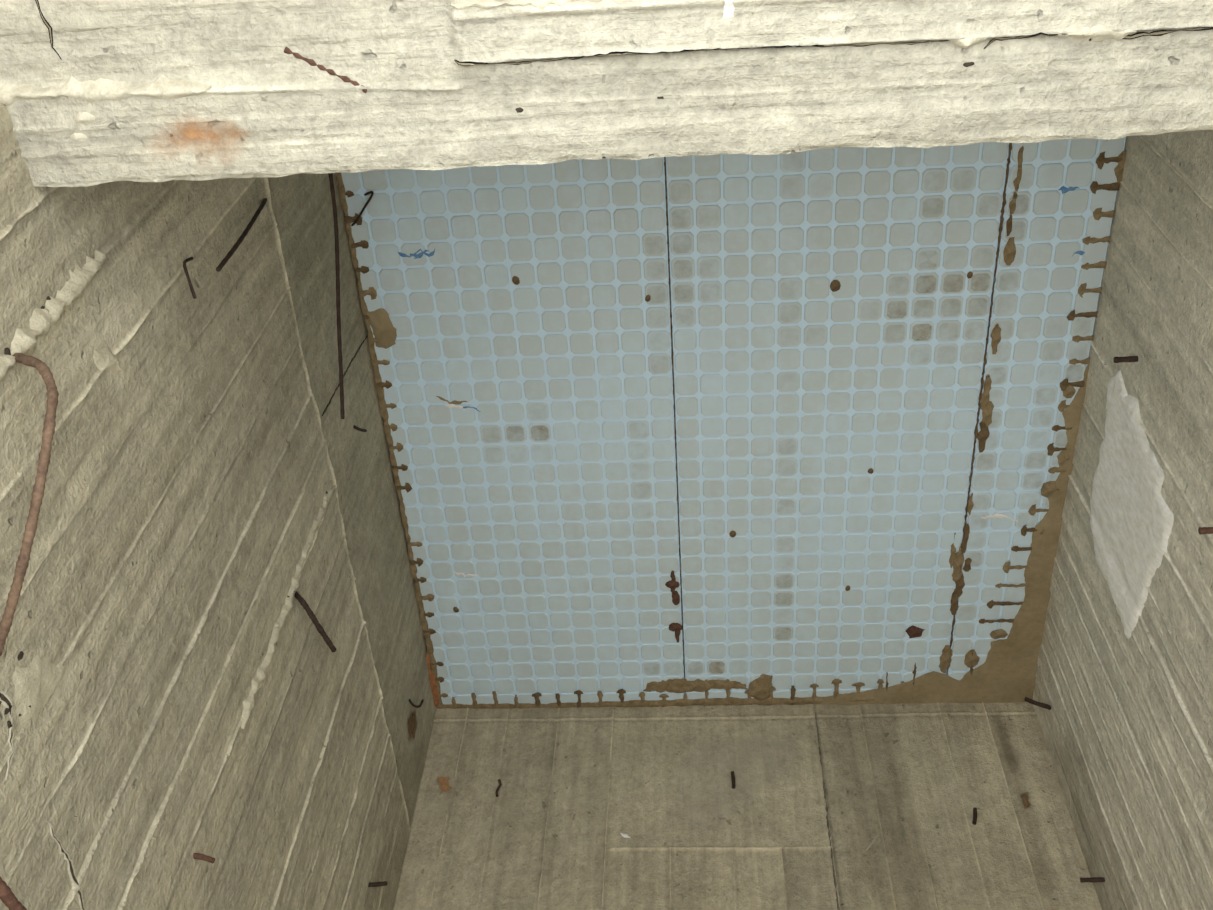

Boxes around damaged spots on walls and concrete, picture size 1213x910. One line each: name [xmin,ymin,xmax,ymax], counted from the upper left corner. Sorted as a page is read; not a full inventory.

crack [35,0,61,59]
rust [664,157,686,693]
rust [906,625,925,638]
crack [0,691,15,781]
crack [46,815,86,910]